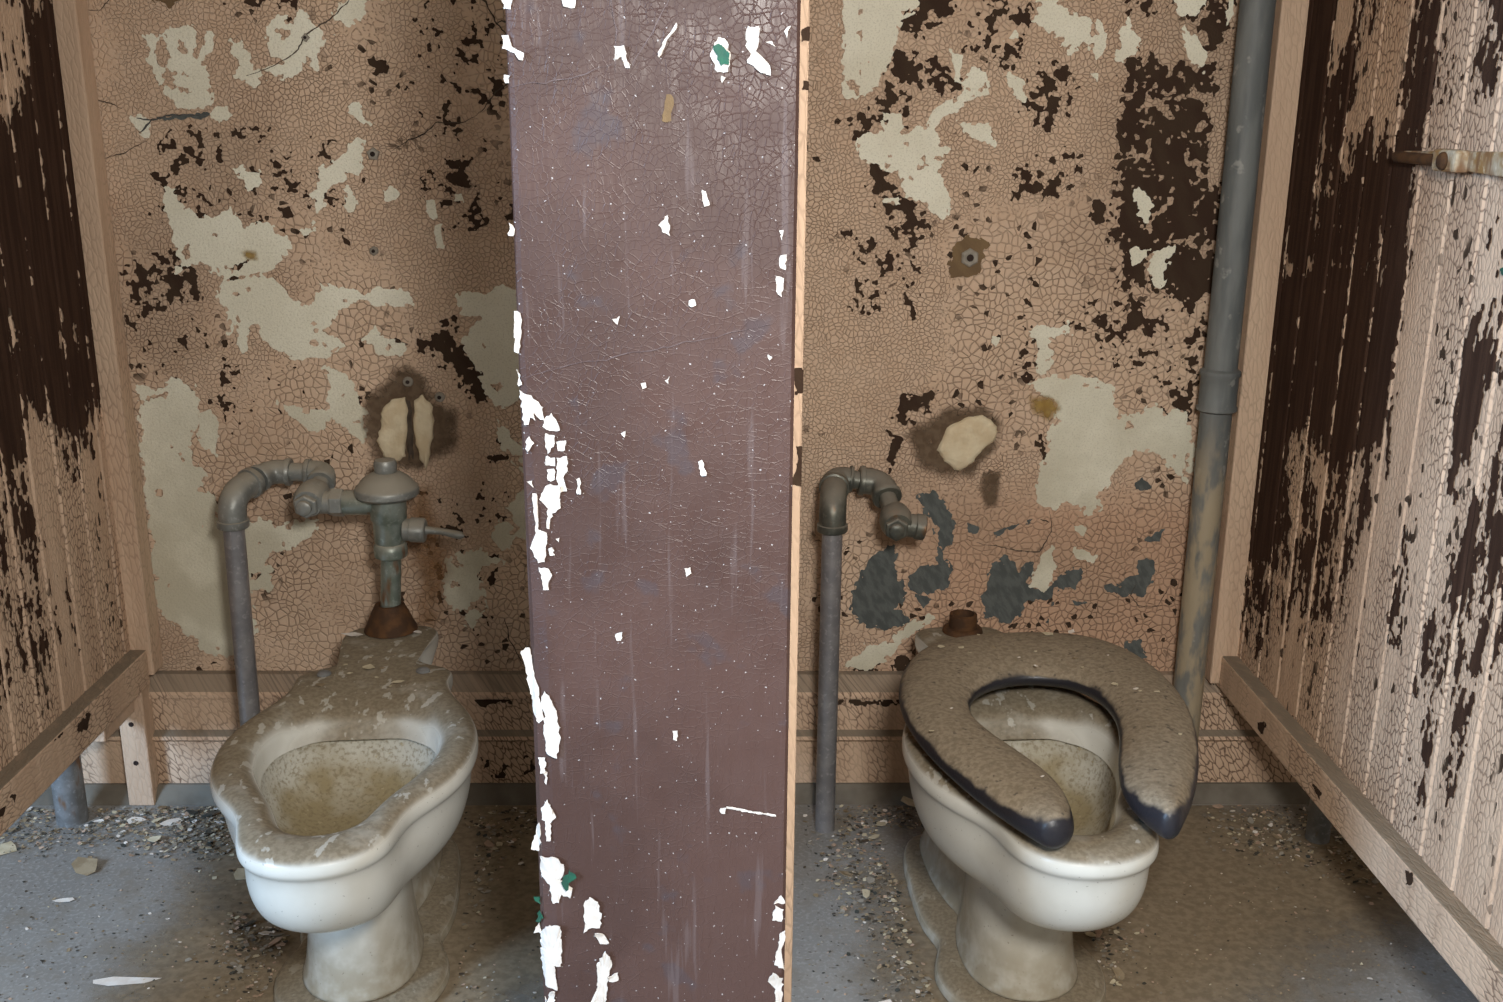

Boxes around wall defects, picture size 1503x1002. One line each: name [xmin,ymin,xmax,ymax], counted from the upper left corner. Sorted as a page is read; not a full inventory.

crack [98,100,209,158]
crack [246,0,349,76]
crack [392,0,669,151]
peeling [710,26,810,82]
peeling [0,0,103,712]
peeling [120,0,581,658]
damp [364,368,456,468]
peeling [775,230,787,297]
peeling [838,0,1237,671]
peeling [1239,0,1503,665]
peeling [461,647,619,1002]
peeling [768,896,786,1002]